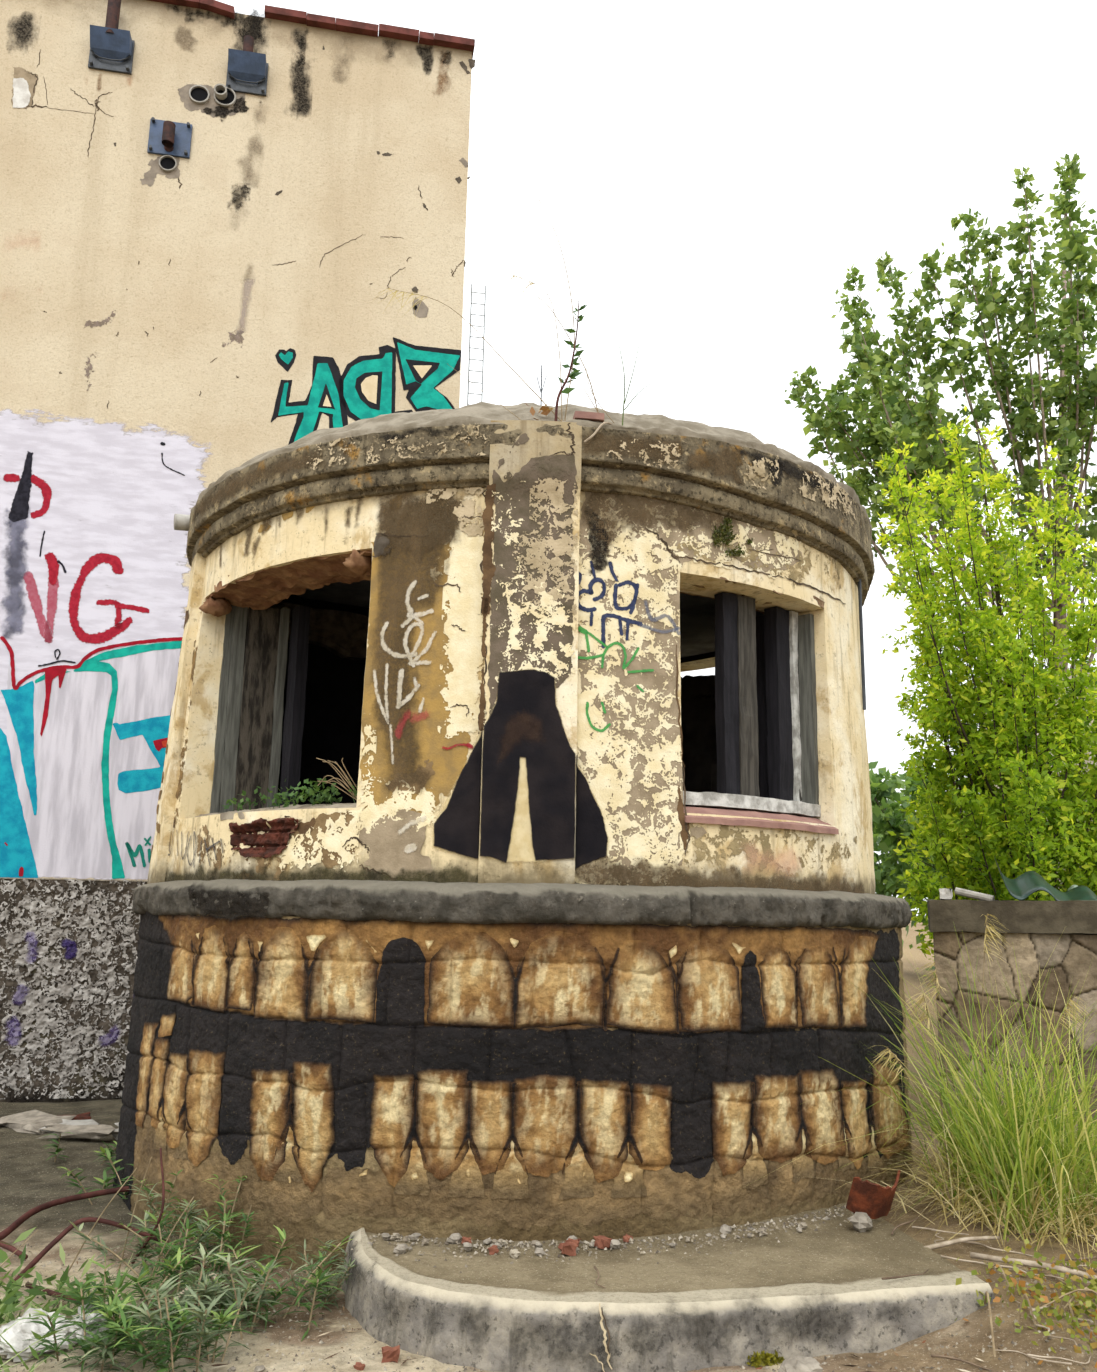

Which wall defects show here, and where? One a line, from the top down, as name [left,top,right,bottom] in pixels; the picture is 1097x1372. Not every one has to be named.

crack [25,49,113,155]
water stain [291,30,311,115]
water stain [232,175,251,209]
peeling [197,423,857,884]